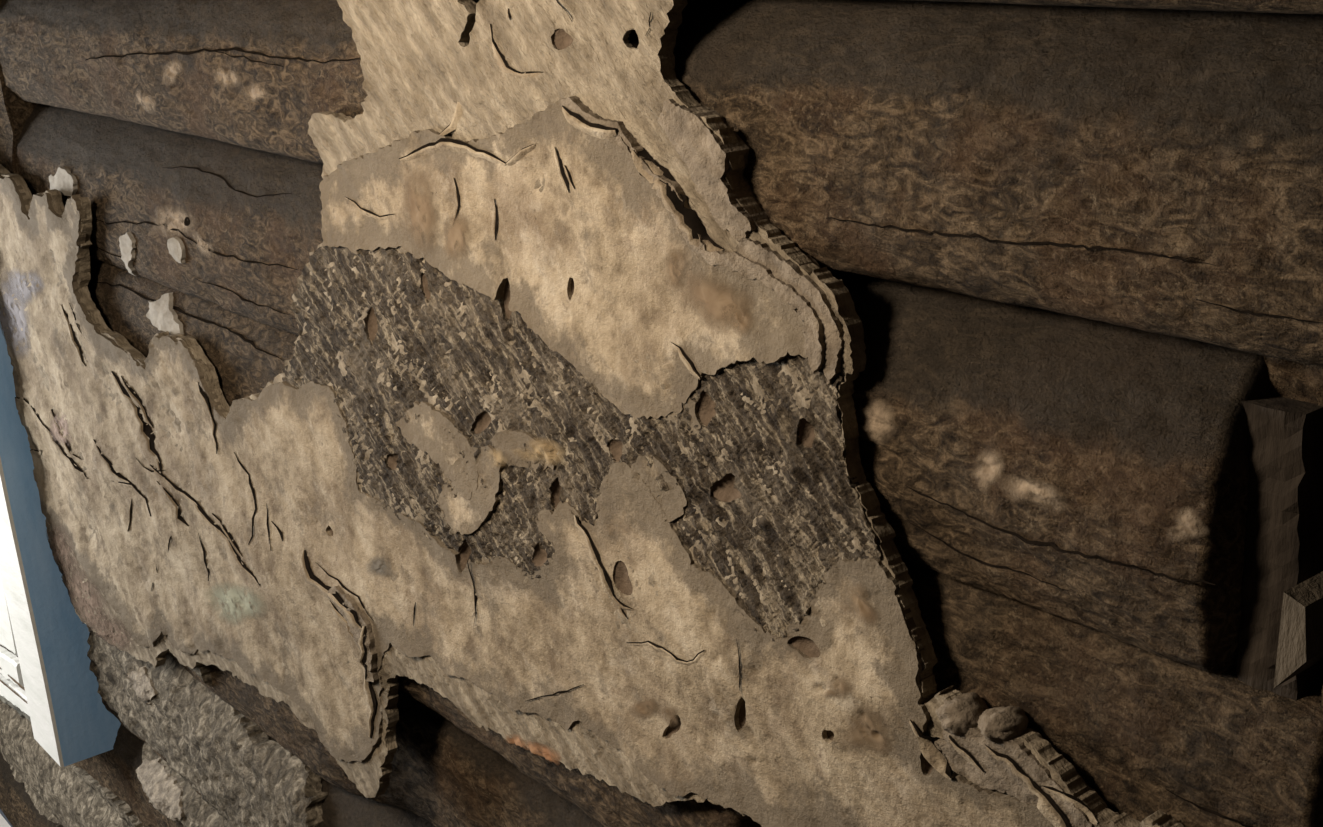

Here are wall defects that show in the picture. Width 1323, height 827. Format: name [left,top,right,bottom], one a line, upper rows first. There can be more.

crack [490,8,543,79]
crack [399,102,724,252]
crack [345,197,396,220]
flaking render [119,232,140,276]
flaking render [167,237,186,264]
crack [671,342,702,380]
crack [15,218,376,738]
flaking render [553,477,562,507]
flaking render [713,473,741,502]
flaking render [830,508,849,533]
flaking render [846,531,862,553]
peeling [136,757,184,821]